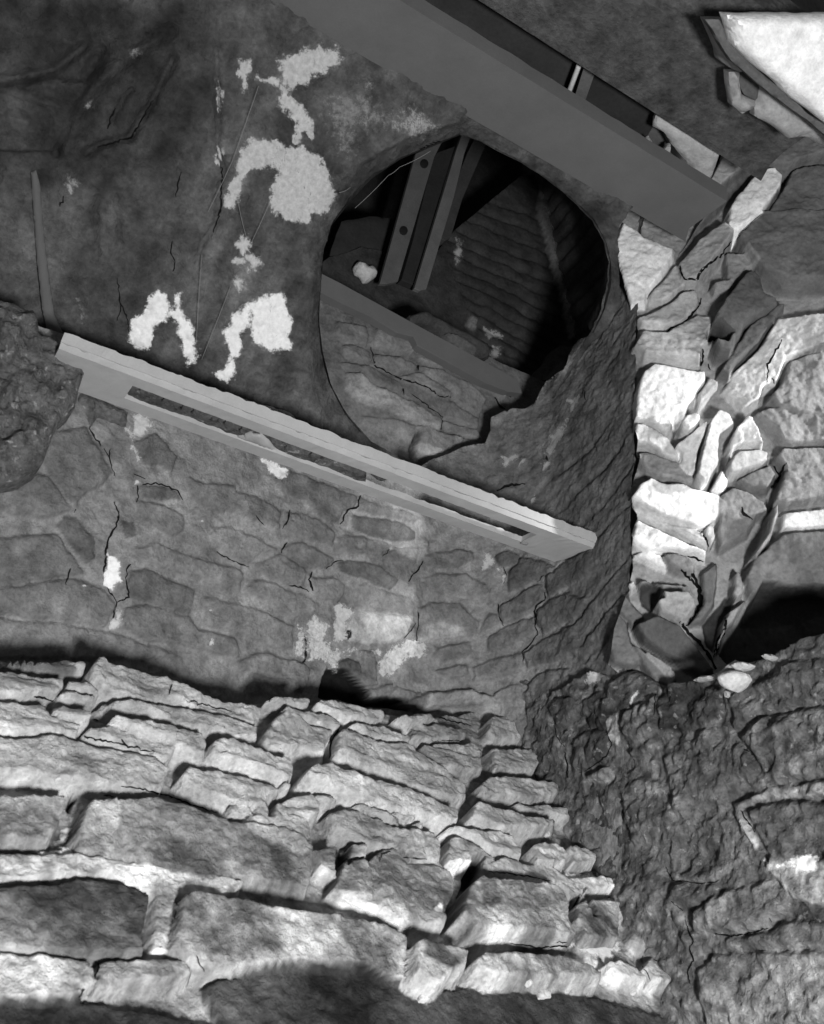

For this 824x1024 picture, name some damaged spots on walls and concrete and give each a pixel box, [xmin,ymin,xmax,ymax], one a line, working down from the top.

crack [89,426,183,619]
crack [340,495,361,524]
damp [103,553,122,590]
damp [293,603,427,677]
crack [666,868,772,983]